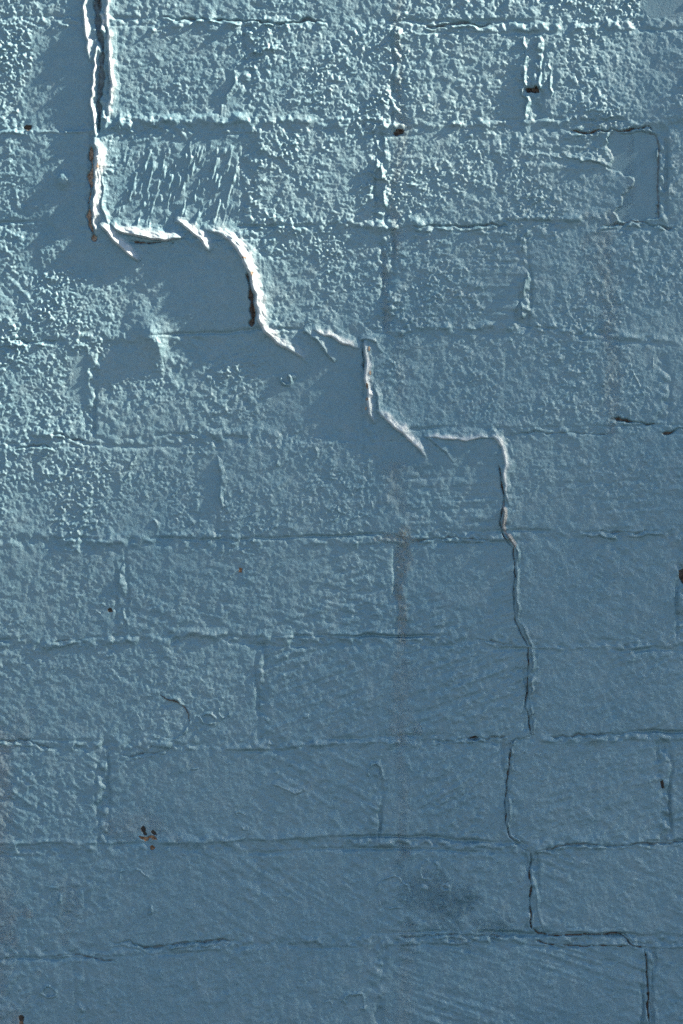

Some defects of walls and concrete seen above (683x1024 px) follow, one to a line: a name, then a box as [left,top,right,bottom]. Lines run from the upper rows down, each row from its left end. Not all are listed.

crack [579,417,673,435]
crack [81,0,651,948]
crack [645,949,659,1024]